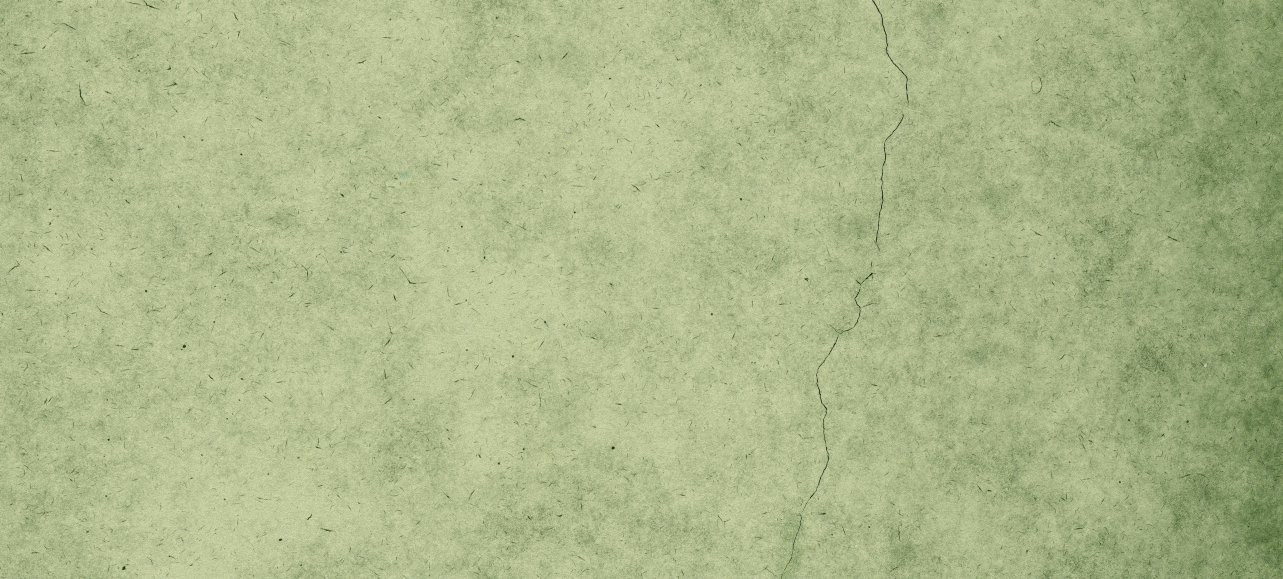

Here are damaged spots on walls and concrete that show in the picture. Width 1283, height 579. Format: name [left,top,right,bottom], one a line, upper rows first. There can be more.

crack [790,0,909,561]